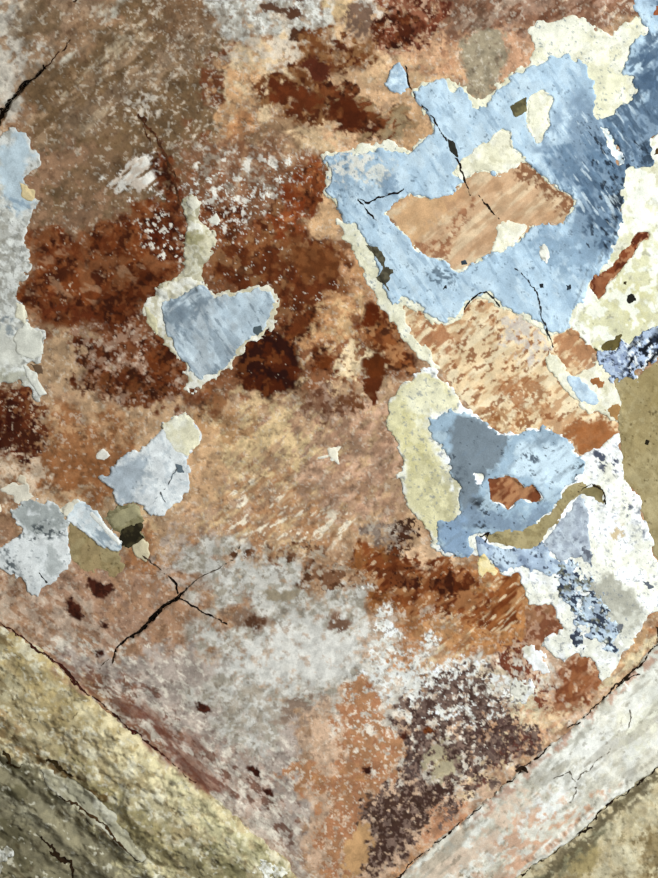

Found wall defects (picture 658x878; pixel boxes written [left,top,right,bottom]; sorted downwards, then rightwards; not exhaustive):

crack [0,39,71,125]
corrosion [249,0,455,145]
crack [358,189,404,220]
crack [405,65,499,219]
corrosion [0,382,56,470]
peeling [142,277,280,394]
corrosion [15,137,428,430]
peeling [318,0,658,704]
peeling [0,412,202,597]
crack [101,546,240,666]
corrosion [228,511,606,722]
crack [397,627,658,878]